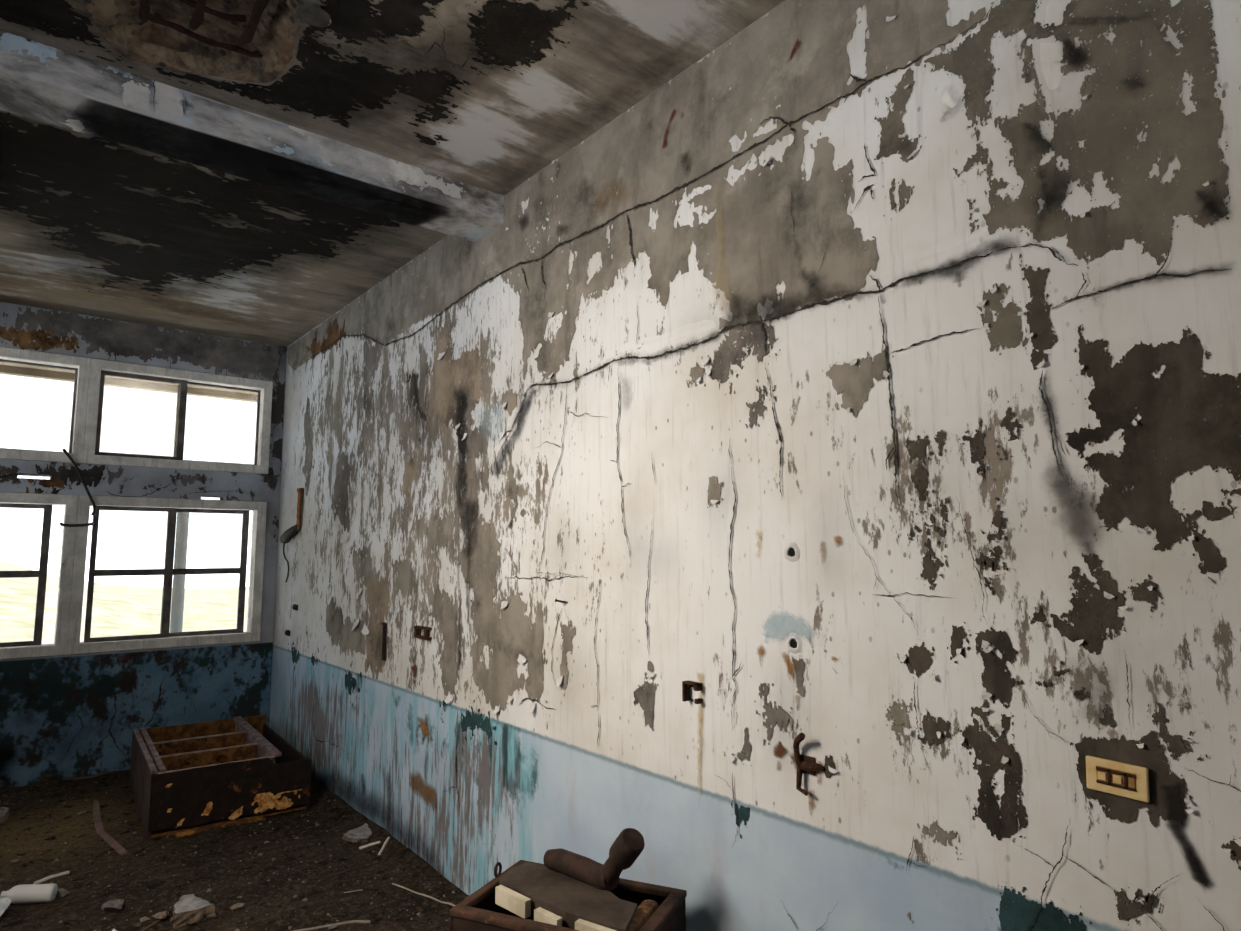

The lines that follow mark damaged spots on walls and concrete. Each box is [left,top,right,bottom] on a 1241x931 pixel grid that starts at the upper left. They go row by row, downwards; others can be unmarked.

crack [298,0,1026,367]
peeling [0,0,1241,731]
damp [456,395,477,555]
peeling [724,657,805,765]
peeling [824,755,838,778]
peeling [882,622,1089,842]
peeling [1070,701,1208,831]
peeling [917,820,962,860]
peeling [1114,887,1163,926]
damp [1164,783,1211,887]
peeling [1221,836,1241,870]